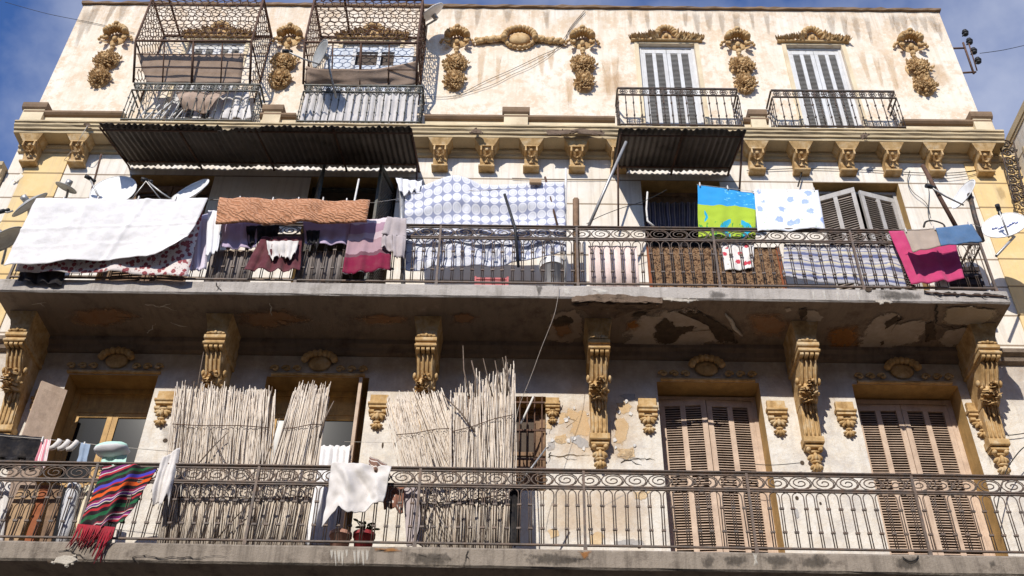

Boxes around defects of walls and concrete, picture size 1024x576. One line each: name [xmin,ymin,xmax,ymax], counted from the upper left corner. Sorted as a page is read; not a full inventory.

peeling [546,294,738,345]
peeling [858,288,998,347]
peeling [546,407,590,451]
peeling [613,394,636,460]